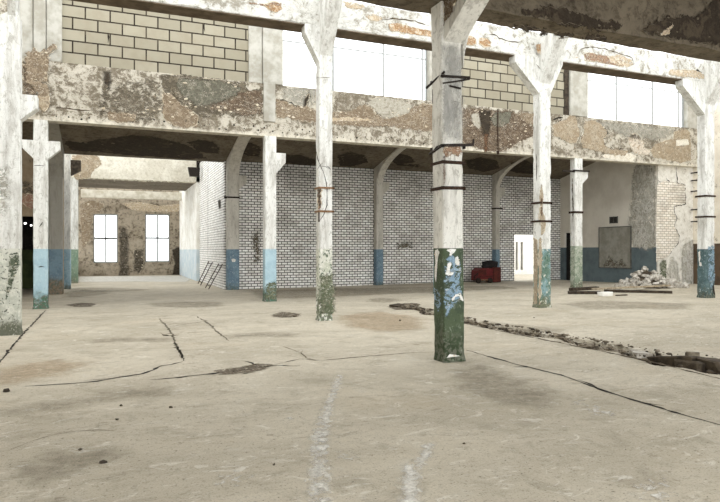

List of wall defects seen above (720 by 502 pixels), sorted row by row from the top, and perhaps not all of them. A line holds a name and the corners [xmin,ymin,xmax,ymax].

flaking render [506,3,622,55]
flaking render [640,0,720,47]
flaking render [22,44,57,113]
flaking render [99,74,263,129]
flaking render [442,107,534,174]
flaking render [552,115,692,163]
flaking render [656,181,686,262]
peeling [434,249,463,316]
crack [0,310,46,362]
crack [34,316,311,386]
crack [473,325,720,379]
crack [467,350,720,425]